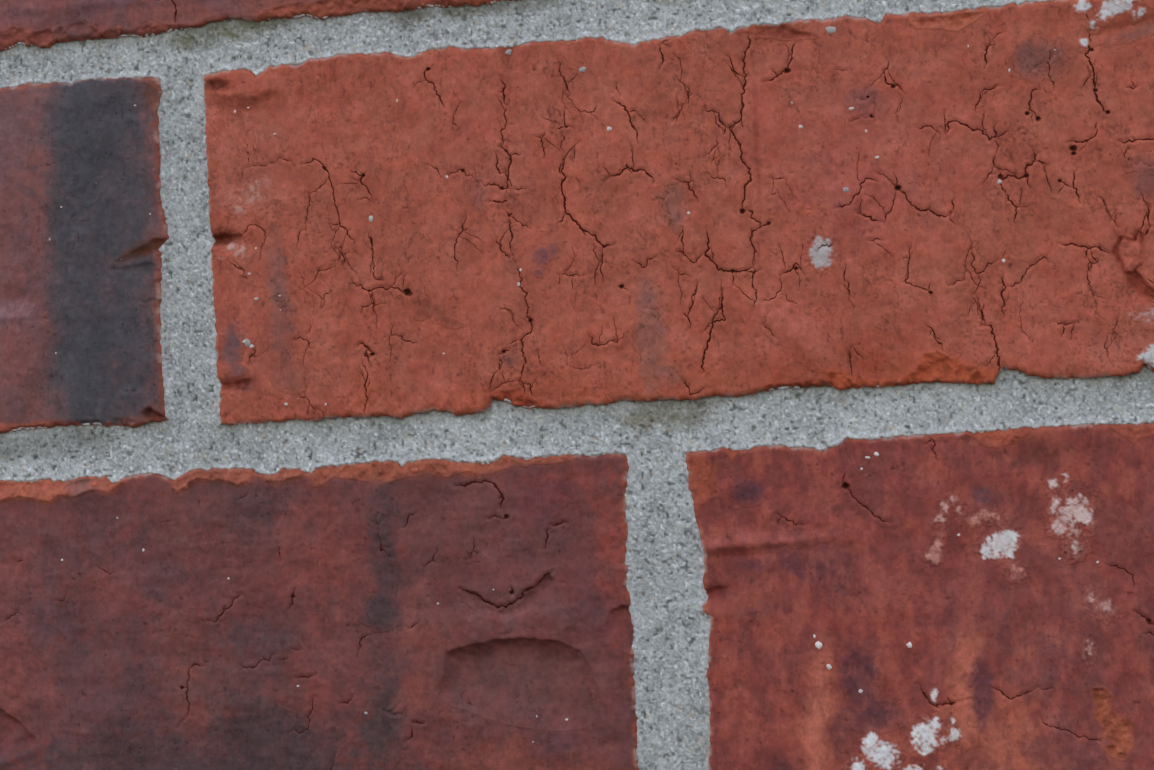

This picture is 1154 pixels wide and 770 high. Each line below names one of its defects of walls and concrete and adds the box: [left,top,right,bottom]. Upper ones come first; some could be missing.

crack [414,67,461,128]
crack [427,34,855,398]
crack [836,14,1154,375]
crack [230,139,418,419]
crack [848,347,863,380]
water stain [1121,300,1154,371]
crack [460,521,567,635]
water stain [918,490,1034,585]
water stain [1038,464,1104,565]
water stain [840,649,962,770]